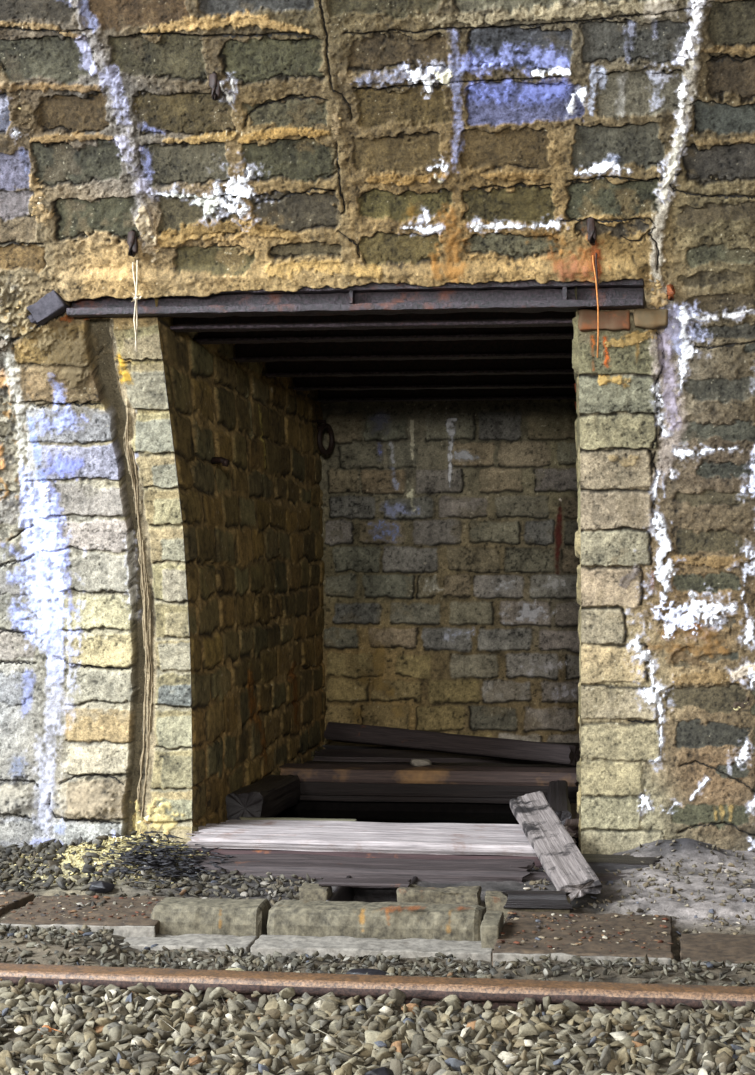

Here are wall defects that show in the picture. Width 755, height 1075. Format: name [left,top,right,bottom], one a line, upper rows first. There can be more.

leakage [75,0,130,124]
leakage [114,136,255,219]
leakage [471,221,561,232]
leakage [406,44,631,183]
leakage [660,83,688,200]
leakage [676,0,705,65]
leakage [652,303,753,436]
leakage [0,336,82,844]
leakage [650,515,755,644]
leakage [629,637,664,762]
crack [678,822,755,836]
crack [679,760,755,792]